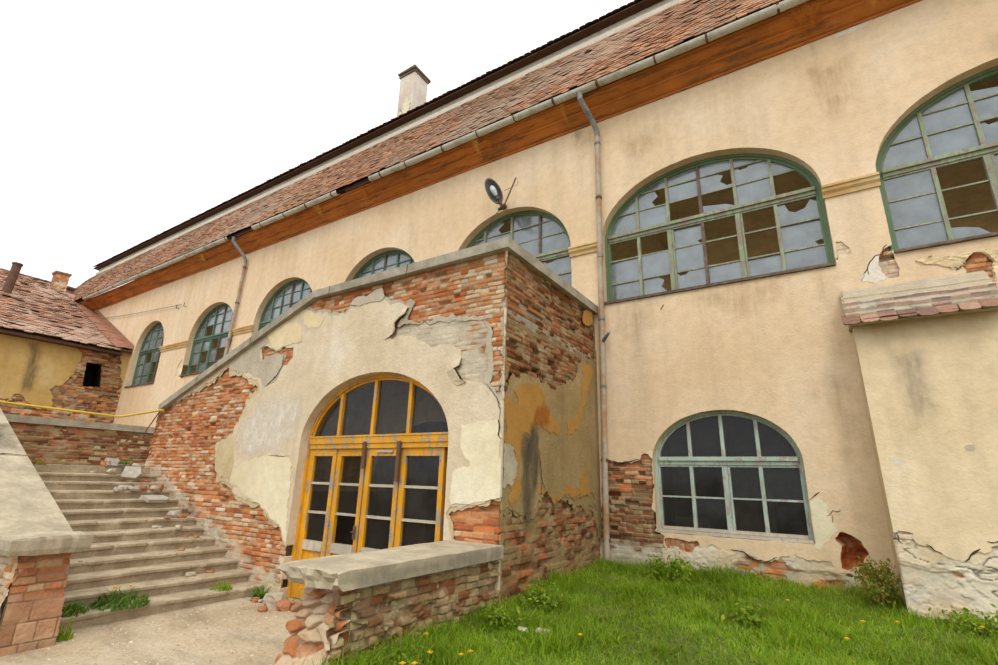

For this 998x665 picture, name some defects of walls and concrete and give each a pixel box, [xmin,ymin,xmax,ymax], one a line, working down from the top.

flaking render [862,247,899,283]
spalling [915,248,998,288]
flaking render [0,252,700,603]
damp [523,427,538,521]
peeling [810,498,869,577]